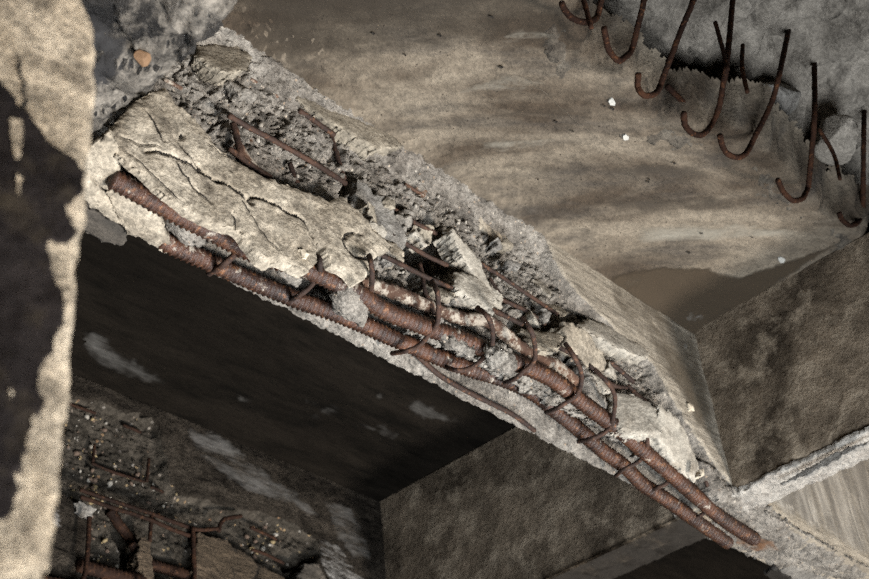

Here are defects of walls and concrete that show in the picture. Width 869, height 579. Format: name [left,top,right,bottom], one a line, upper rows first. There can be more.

crack [121,112,308,249]
spalling [543,0,648,79]
spalling [634,0,791,160]
spalling [751,62,842,211]
spalling [83,26,770,549]
spalling [44,399,326,579]
spalling [711,504,868,579]
spalling [731,426,869,512]